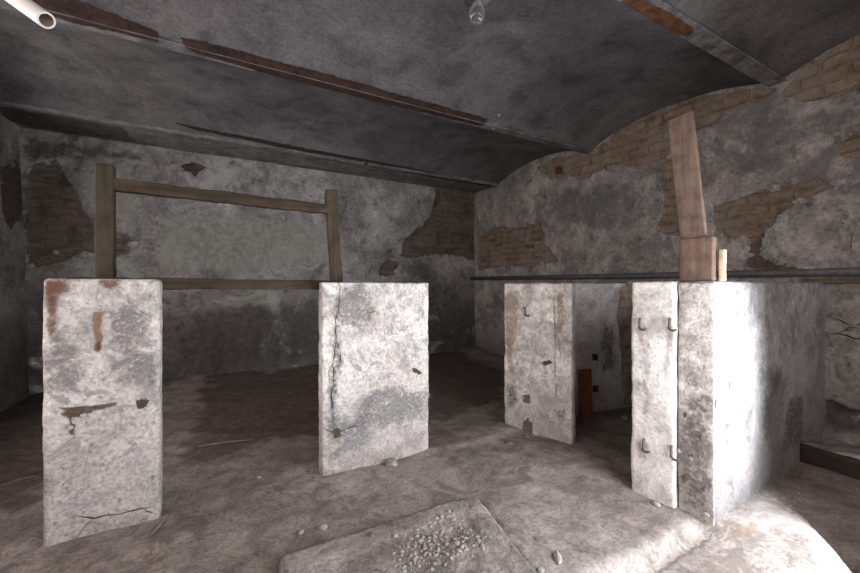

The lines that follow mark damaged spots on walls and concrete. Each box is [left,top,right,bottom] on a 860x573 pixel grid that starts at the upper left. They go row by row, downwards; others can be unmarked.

rust [621,0,693,36]
flaking render [537,34,860,236]
spalling [180,161,206,177]
flaking render [0,159,95,273]
flaking render [379,188,558,280]
flaking render [714,178,860,270]
rust [45,280,68,332]
rust [93,312,103,351]
crack [825,314,860,340]
spalling [61,402,116,435]
spalling [136,399,149,409]
crack [75,460,155,539]